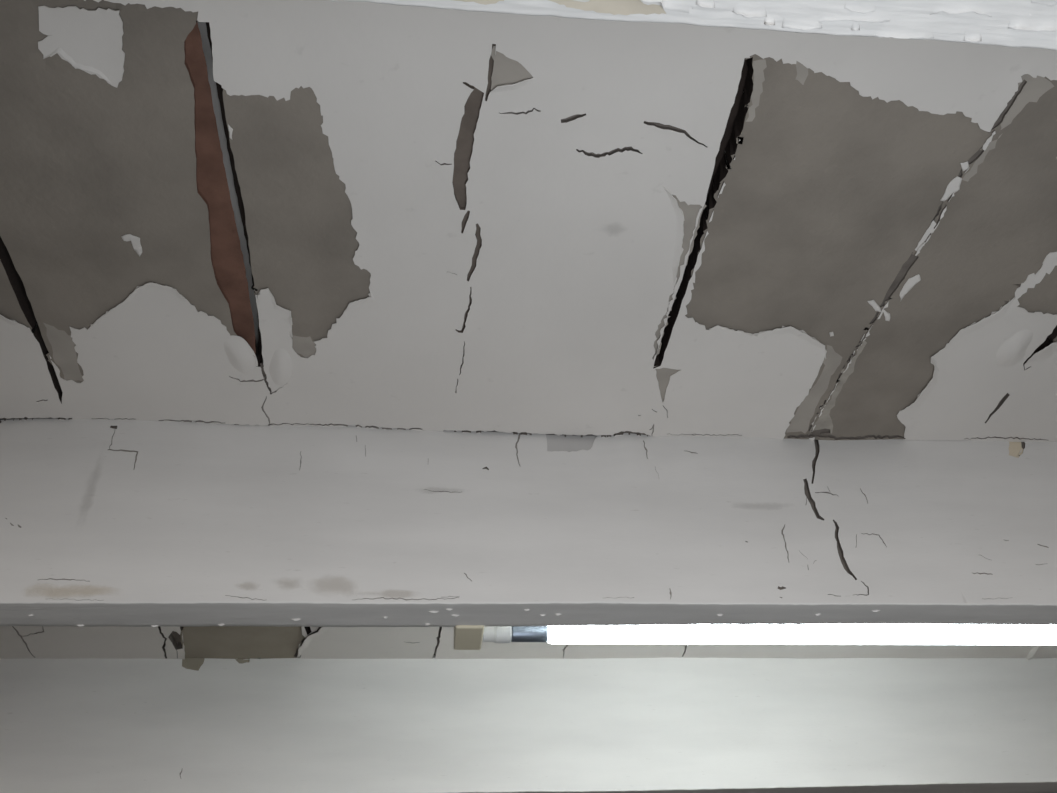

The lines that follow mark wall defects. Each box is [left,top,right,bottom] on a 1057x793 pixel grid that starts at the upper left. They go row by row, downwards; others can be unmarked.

peeling [549,0,715,15]
peeling [732,0,992,39]
crack [576,147,643,158]
crack [644,121,707,147]
peeling [0,0,237,383]
peeling [223,86,375,358]
crack [436,44,586,393]
peeling [652,54,1057,440]
crack [781,80,1027,596]
crack [1023,325,1057,370]
crack [965,393,1049,456]
peeling [181,619,330,671]